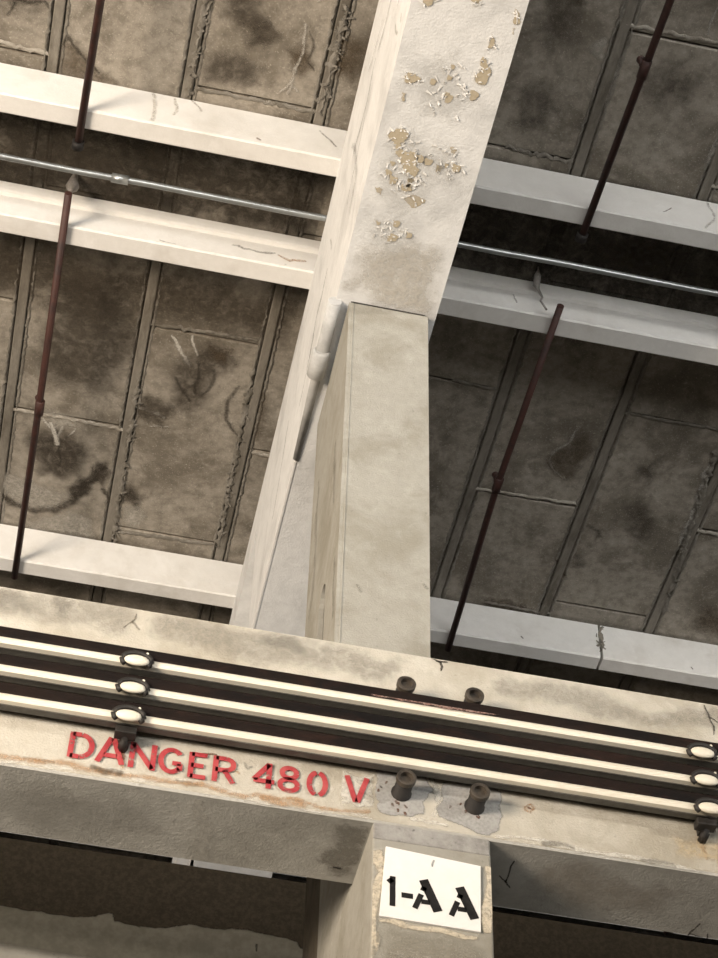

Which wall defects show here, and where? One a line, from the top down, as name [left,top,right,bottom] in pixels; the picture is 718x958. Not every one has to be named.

damp [206,58,253,81]
peeling [402,71,424,101]
peeling [474,36,497,85]
peeling [387,125,426,208]
damp [136,335,229,427]
damp [2,413,143,537]
corrosion [59,752,131,777]